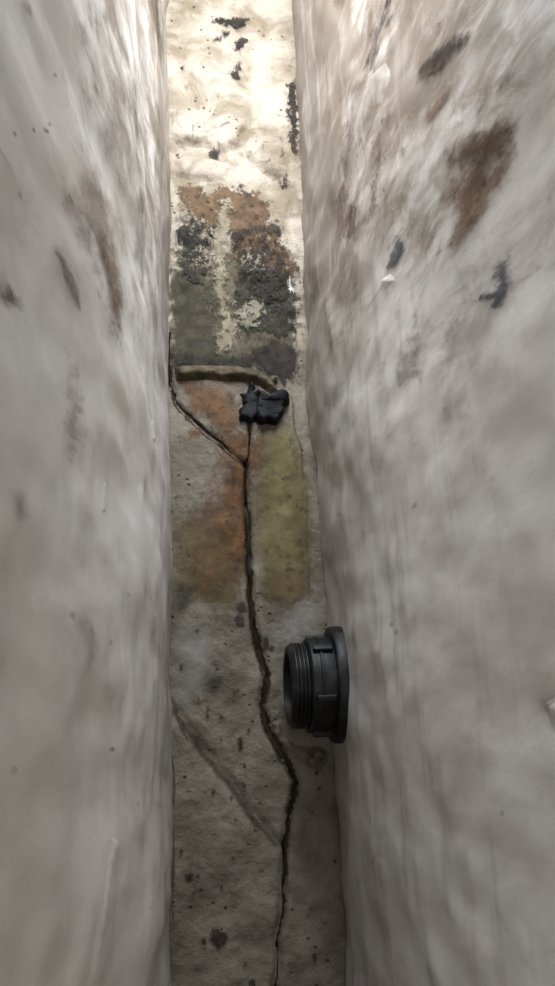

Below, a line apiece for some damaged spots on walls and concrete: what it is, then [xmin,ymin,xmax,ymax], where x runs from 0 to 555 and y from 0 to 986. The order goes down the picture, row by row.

water stain [169,197,302,385]
rust [184,382,262,593]
crack [168,331,299,986]